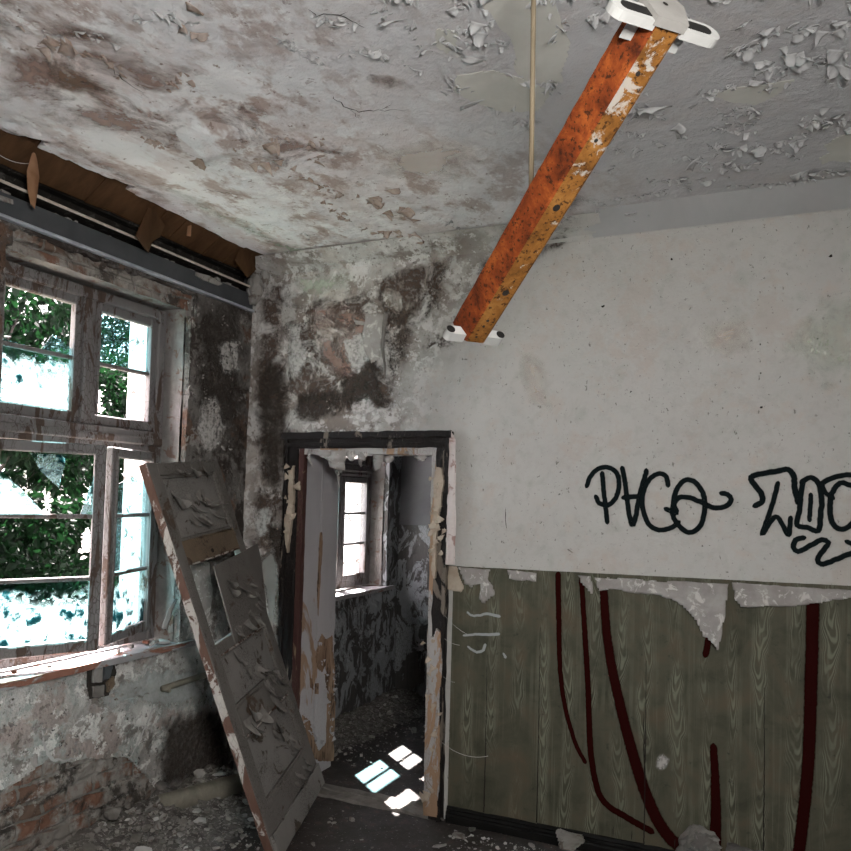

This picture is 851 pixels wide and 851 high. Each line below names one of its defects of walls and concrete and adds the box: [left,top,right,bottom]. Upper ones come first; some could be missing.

damp [59,30,110,41]
damp [13,53,178,141]
peeling [126,2,209,42]
peeling [370,0,575,132]
peeling [190,158,206,171]
peeling [249,137,424,245]
damp [198,305,239,450]
damp [253,262,446,641]
spalling [0,717,156,851]
damp [162,711,225,787]
peeling [302,634,338,761]
peeling [419,628,443,817]